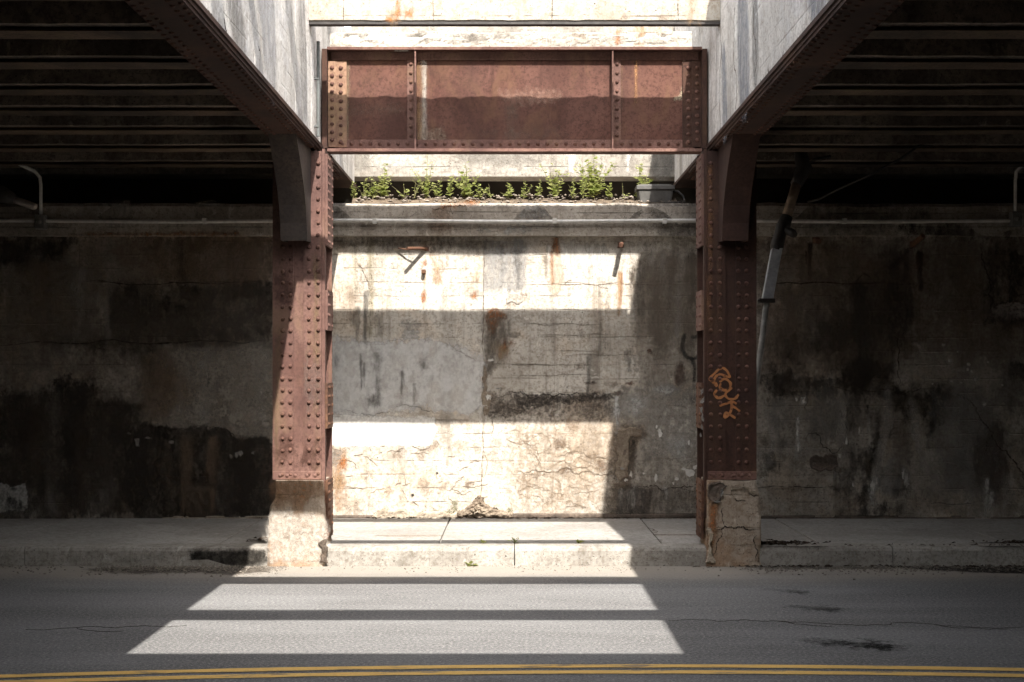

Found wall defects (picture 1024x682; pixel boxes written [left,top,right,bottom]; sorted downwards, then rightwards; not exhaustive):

water stain [332,294,484,416]
rust [485,308,513,355]
crack [340,205,696,514]
water stain [0,376,329,566]
rust [270,451,346,508]